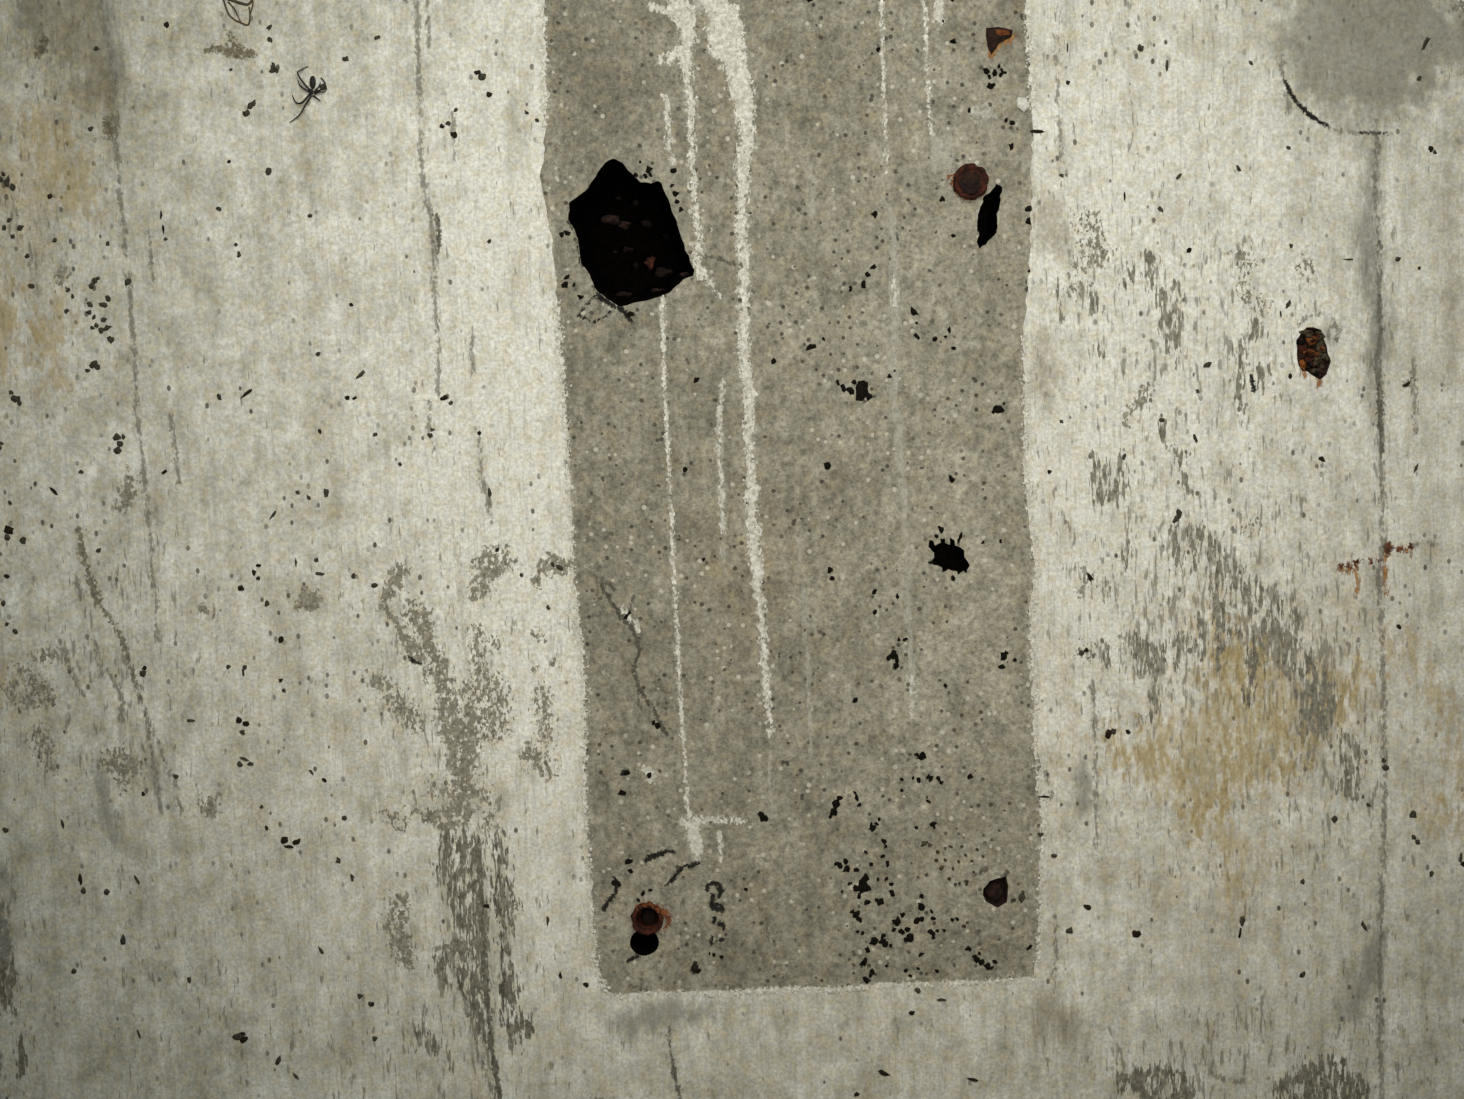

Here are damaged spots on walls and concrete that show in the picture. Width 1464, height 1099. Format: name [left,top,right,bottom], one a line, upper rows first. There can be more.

efflorescence [658,295,747,863]
efflorescence [647,0,778,737]
peeling [462,0,1042,994]
rust [1296,327,1331,388]